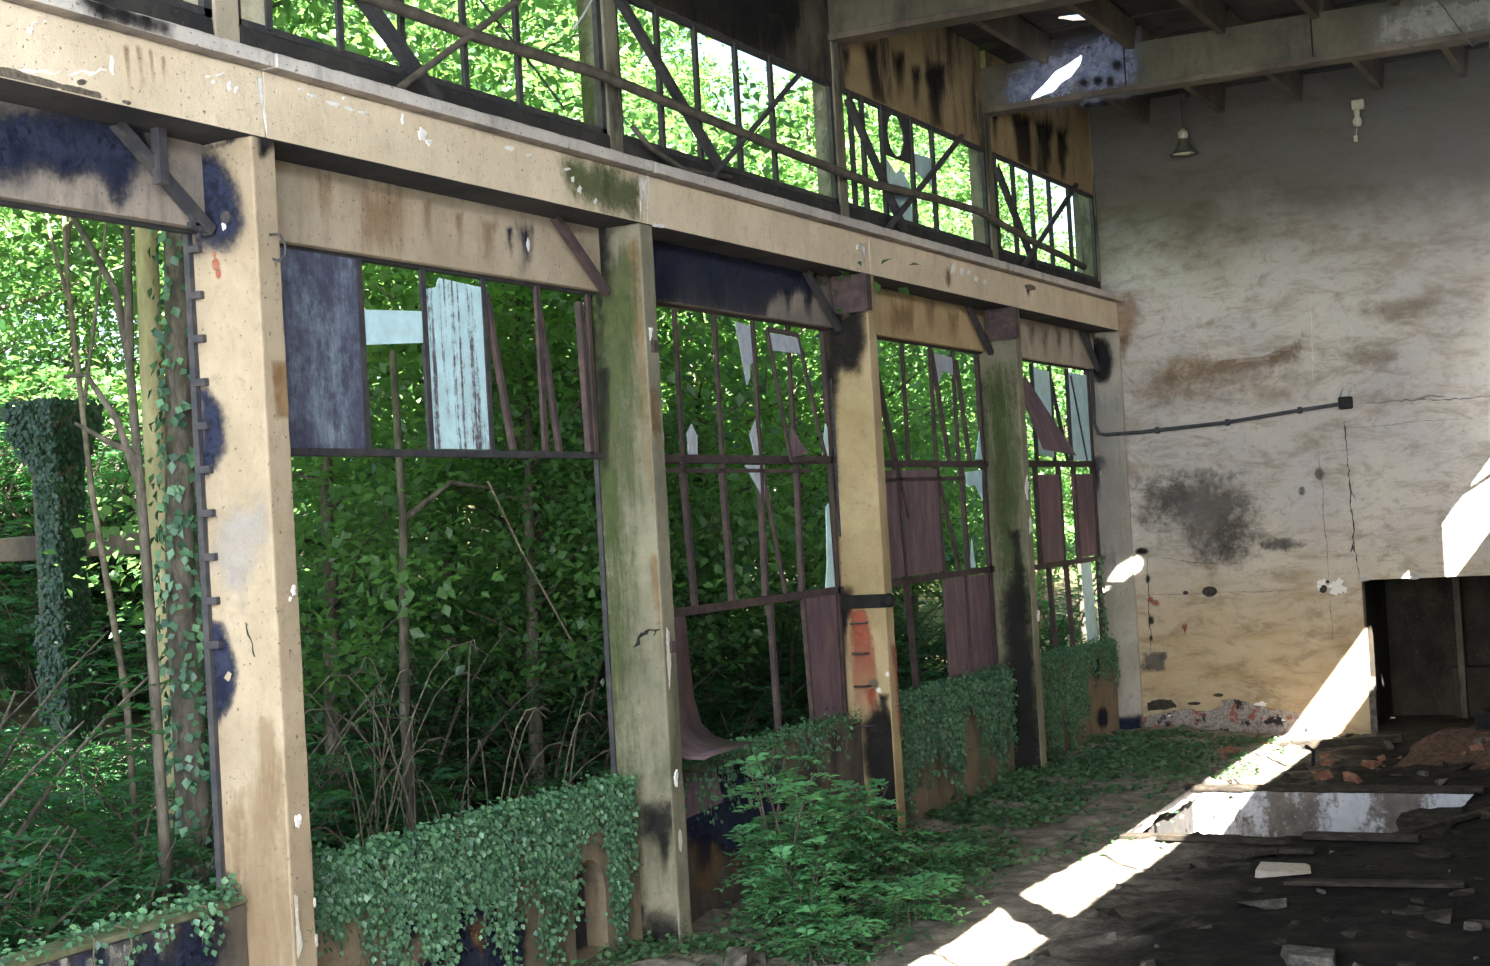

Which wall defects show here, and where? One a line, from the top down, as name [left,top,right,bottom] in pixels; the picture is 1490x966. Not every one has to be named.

leakage [893,53,945,124]
leakage [1037,121,1067,177]
leakage [1138,471,1301,563]
crack [1136,395,1490,653]
crack [634,629,660,648]
spalling [1144,693,1309,735]